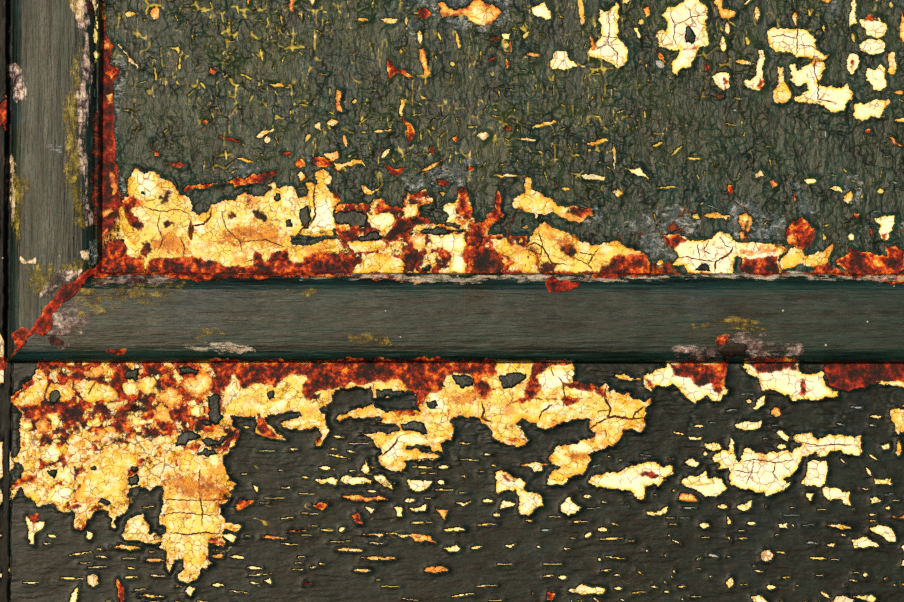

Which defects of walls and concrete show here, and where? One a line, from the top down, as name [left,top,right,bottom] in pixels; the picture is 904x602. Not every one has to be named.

crack [671,9,705,46]
peeling [736,0,903,121]
corrosion [0,0,429,370]
peeling [103,135,833,273]
corrosion [457,187,723,292]
corrosion [210,349,498,420]
corrosion [512,359,607,406]
corrosion [669,360,728,394]
peeling [742,363,838,417]
crack [163,470,229,535]
peeling [0,362,728,596]
peeling [679,431,862,511]